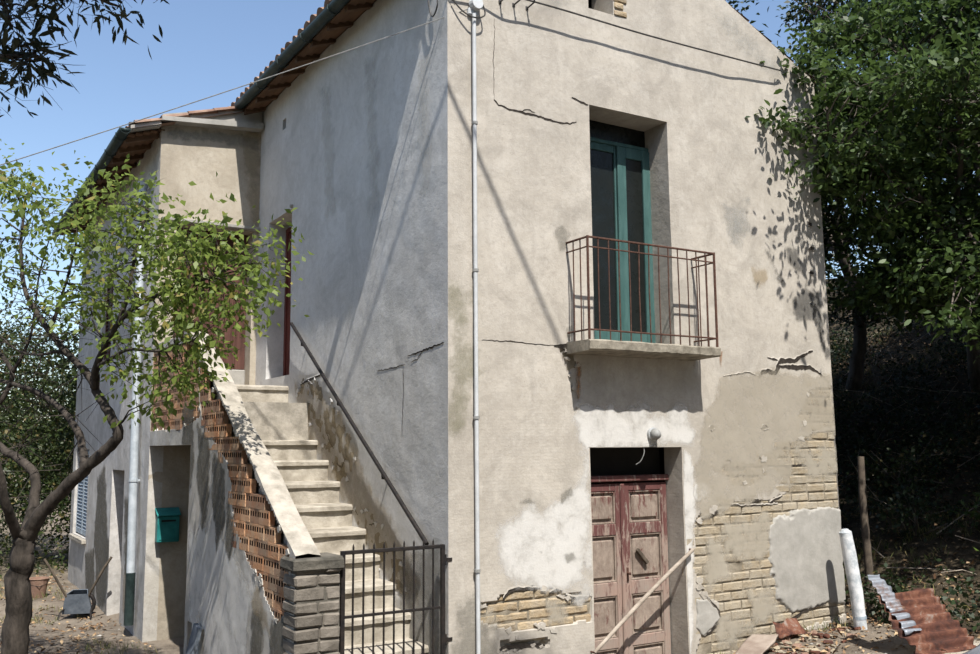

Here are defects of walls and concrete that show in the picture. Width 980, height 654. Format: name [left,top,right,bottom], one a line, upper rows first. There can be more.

crack [494,97,588,124]
crack [378,342,444,422]
crack [492,340,572,353]
crack [723,349,823,377]
spalling [151,341,312,624]
spalling [682,386,845,654]
spalling [480,586,591,654]